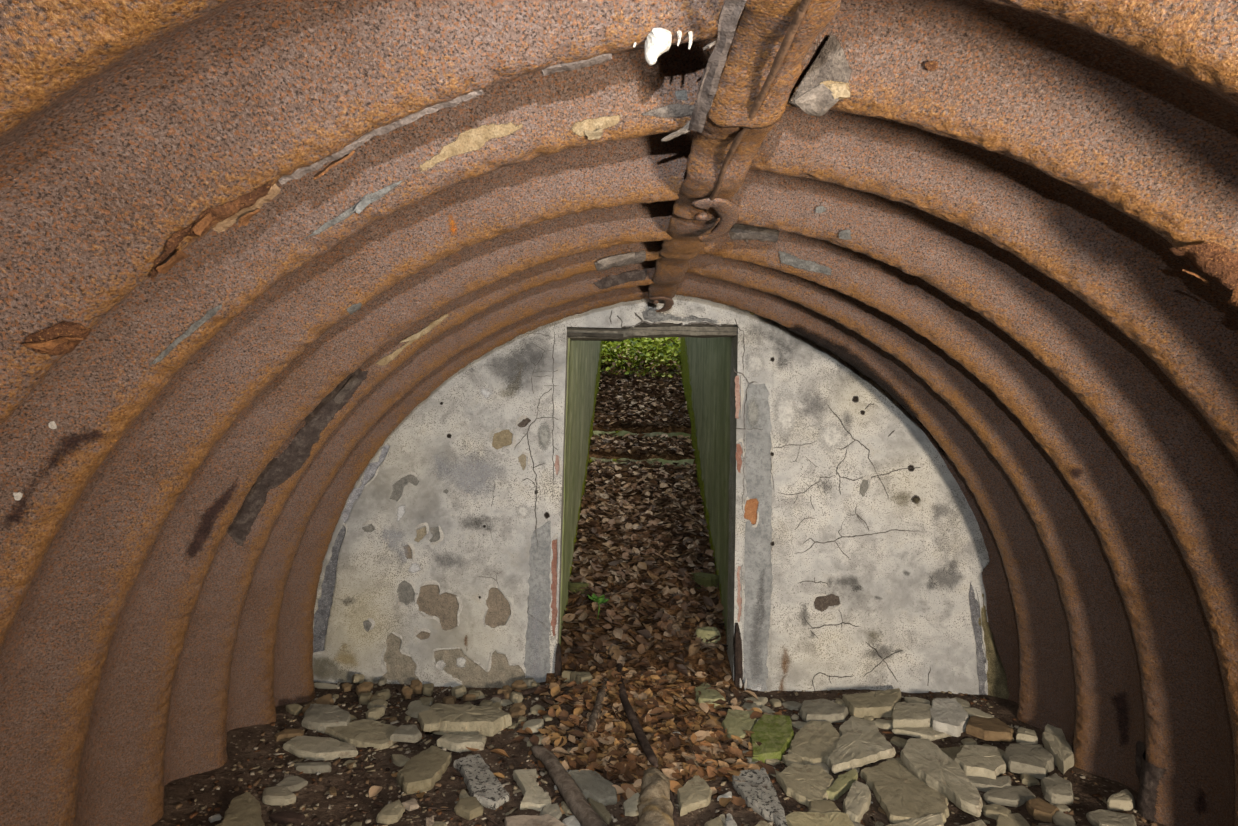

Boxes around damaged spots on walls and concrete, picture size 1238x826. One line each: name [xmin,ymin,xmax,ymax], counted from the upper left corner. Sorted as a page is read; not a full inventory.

peeling [789,35,852,117]
peeling [212,89,484,239]
corrosion [150,181,273,278]
corrosion [1168,242,1238,307]
corrosion [22,321,92,355]
spalling [489,415,531,470]
crack [609,310,931,691]
spalling [379,512,558,688]